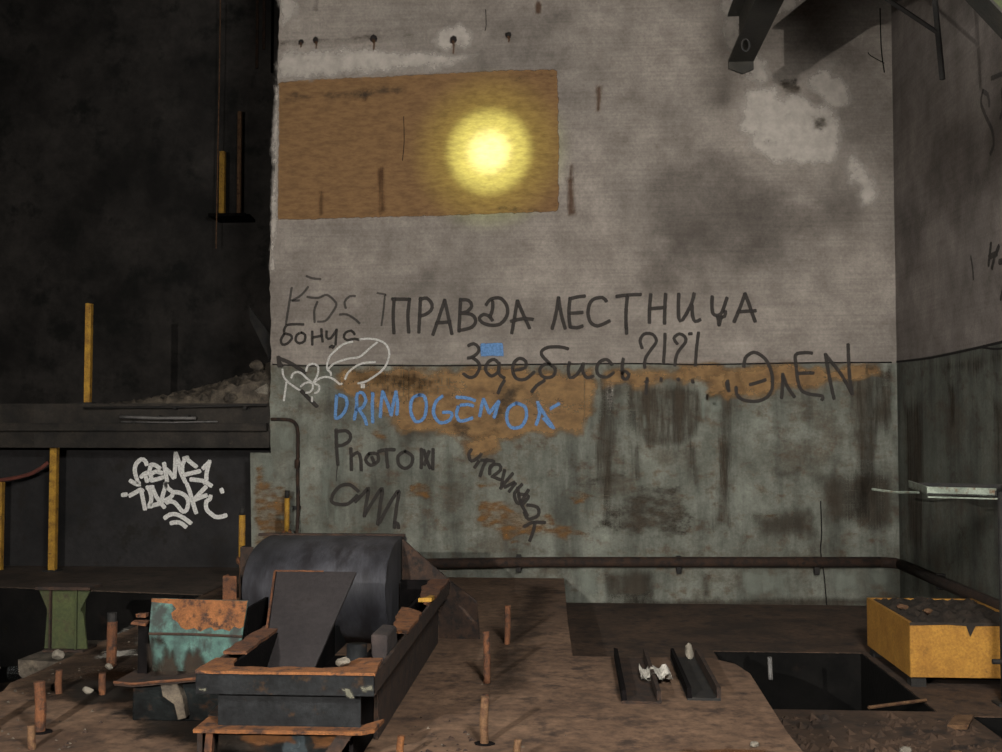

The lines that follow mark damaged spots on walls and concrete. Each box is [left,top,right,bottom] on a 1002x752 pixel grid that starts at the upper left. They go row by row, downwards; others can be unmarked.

leakage [628,386,730,444]
corrosion [255,466,291,543]
corrosion [477,502,586,539]
leakage [597,382,686,533]
leakage [907,407,922,546]